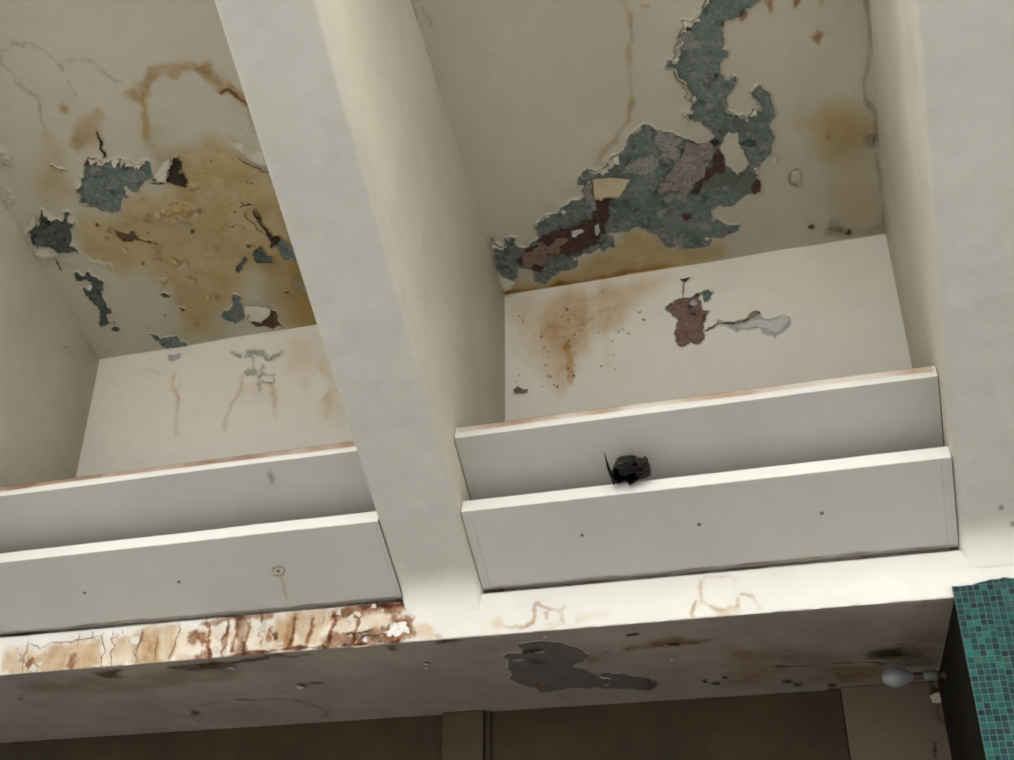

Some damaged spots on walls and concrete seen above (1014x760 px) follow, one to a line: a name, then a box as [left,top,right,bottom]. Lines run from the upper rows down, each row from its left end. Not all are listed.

peeling [491,0,778,292]
peeling [22,131,190,332]
peeling [235,202,297,273]
peeling [220,292,288,329]
peeling [284,278,307,294]
peeling [665,277,792,348]
peeling [147,332,189,362]
corrosion [68,620,167,645]
corrosion [193,615,278,663]
spalling [502,640,657,692]